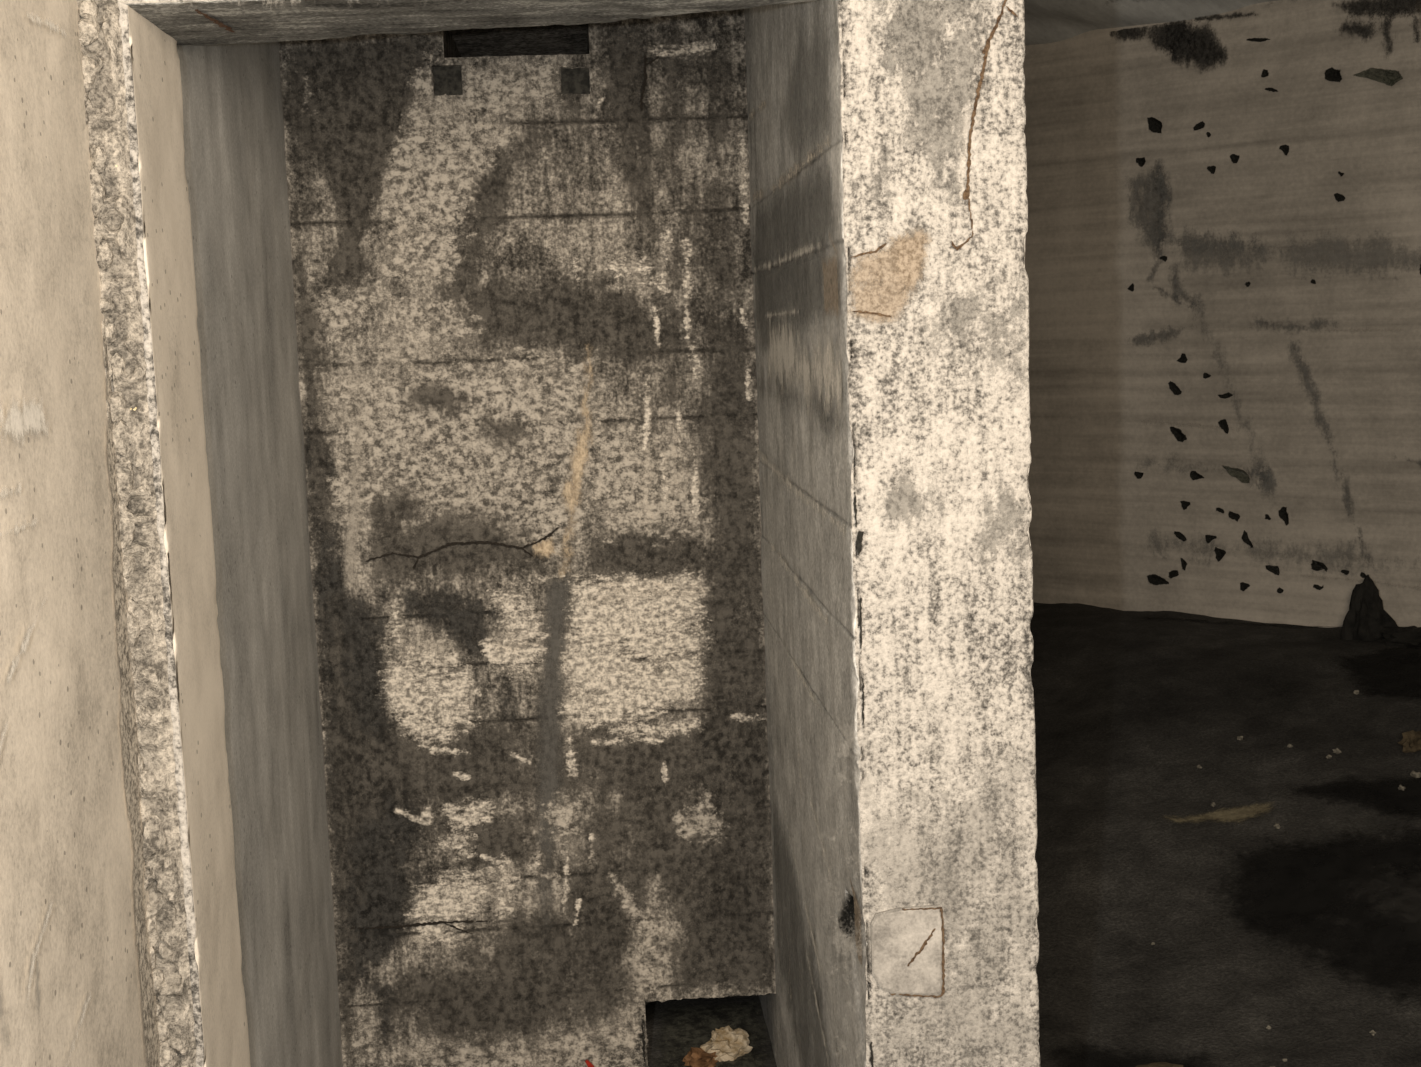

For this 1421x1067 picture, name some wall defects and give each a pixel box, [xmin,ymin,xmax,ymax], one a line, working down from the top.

leakage [1111,12,1256,70]
leakage [1341,0,1421,52]
crack [951,0,1018,251]
leakage [1130,165,1195,304]
crack [366,527,558,569]
leakage [538,578,571,940]